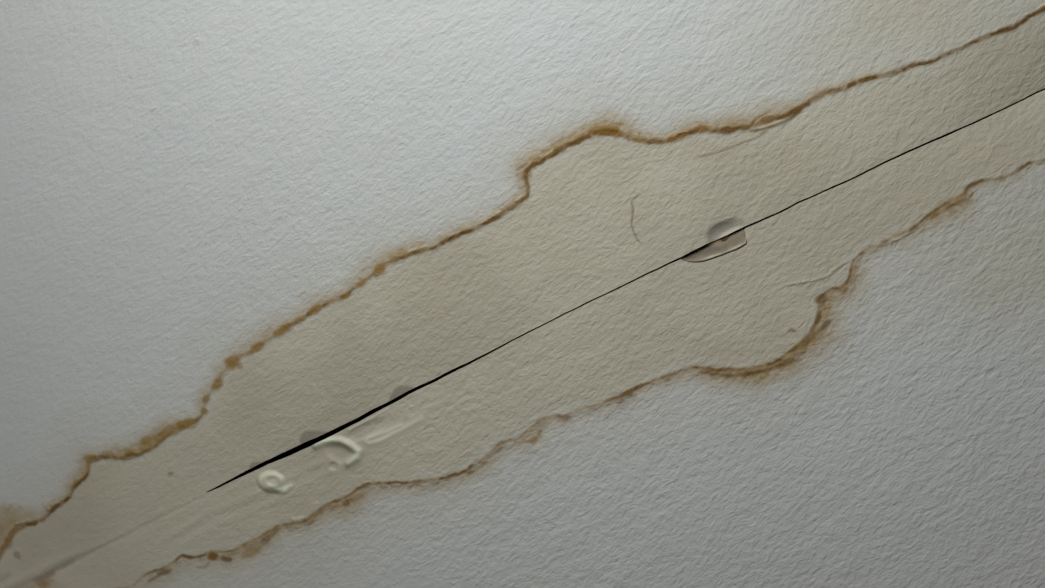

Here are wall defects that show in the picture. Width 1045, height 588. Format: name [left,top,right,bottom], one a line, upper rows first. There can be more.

leakage [767,6,1045,130]
leakage [551,142,569,156]
leakage [564,131,599,151]
leakage [587,125,626,139]
leakage [621,130,675,148]
leakage [665,131,690,144]
leakage [711,125,737,136]
crack [715,88,1045,241]
leakage [106,153,1045,588]
crack [15,242,711,588]
leakage [81,453,99,463]
leakage [25,462,96,529]